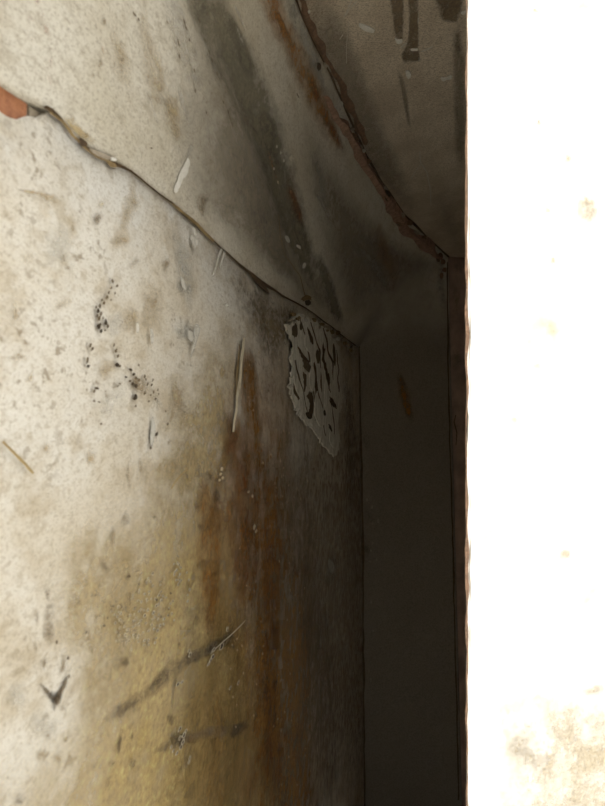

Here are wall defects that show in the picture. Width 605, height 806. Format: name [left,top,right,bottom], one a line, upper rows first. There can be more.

spalling [0,86,41,120]
rust [267,0,442,260]
damp [391,0,419,62]
damp [437,0,462,21]
crack [44,105,366,806]
flaking render [284,312,356,457]
crack [296,0,459,800]